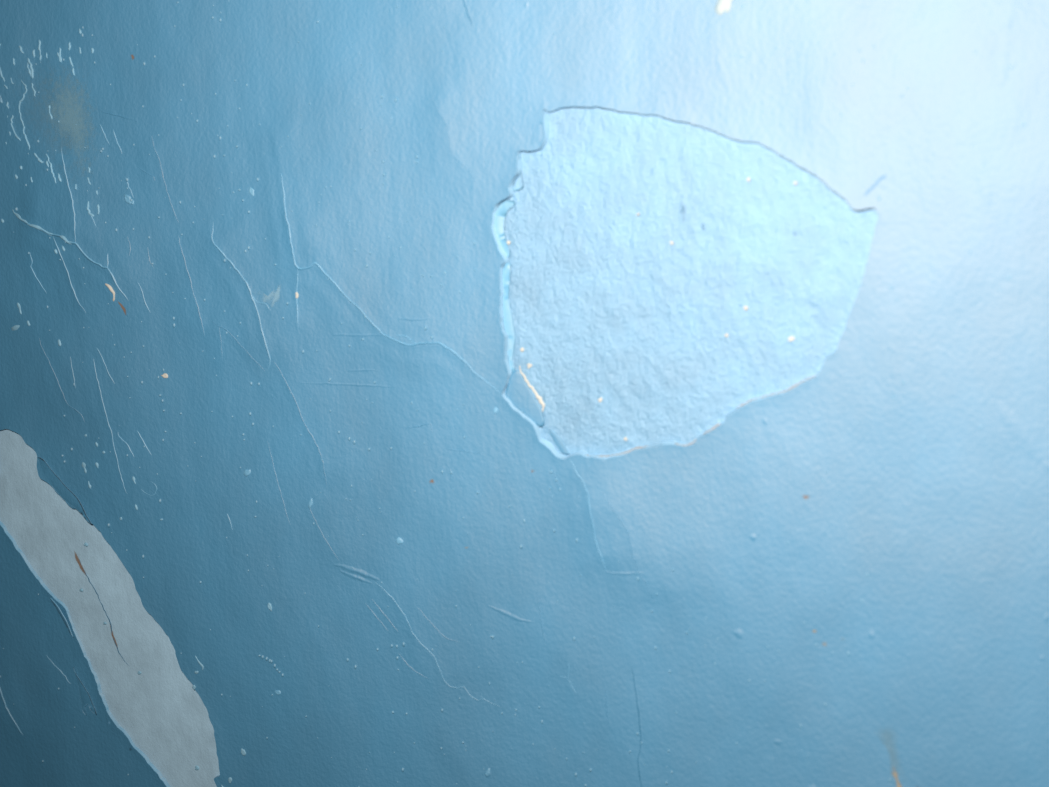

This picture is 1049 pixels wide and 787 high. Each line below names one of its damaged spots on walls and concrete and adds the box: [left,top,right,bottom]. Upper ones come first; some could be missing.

crack [12,147,128,311]
crack [39,339,127,493]
crack [152,138,339,560]
crack [281,175,502,395]
peeling [491,106,878,460]
peeling [0,429,232,787]
crack [379,585,501,708]